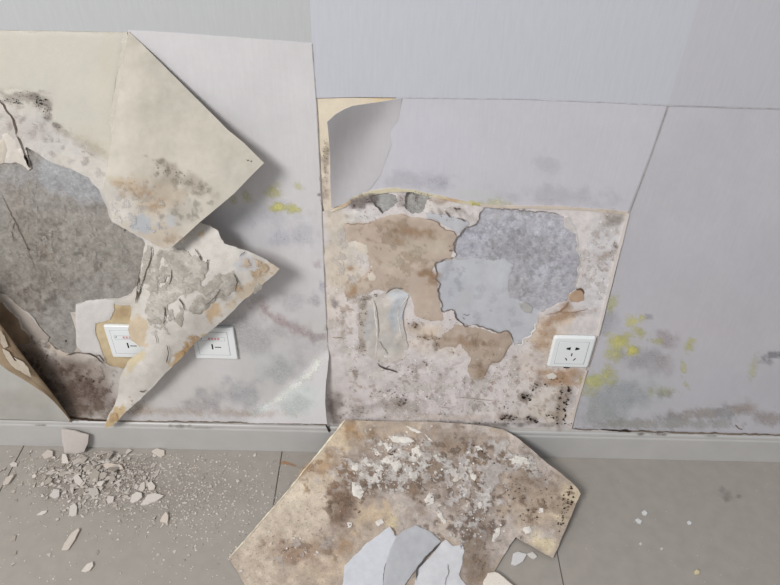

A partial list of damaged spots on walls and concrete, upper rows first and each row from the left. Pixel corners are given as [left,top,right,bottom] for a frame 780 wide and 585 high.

damp [0,91,59,130]
flaking render [0,133,145,363]
flaking render [374,192,584,346]
damp [22,350,112,421]
damp [479,370,780,436]